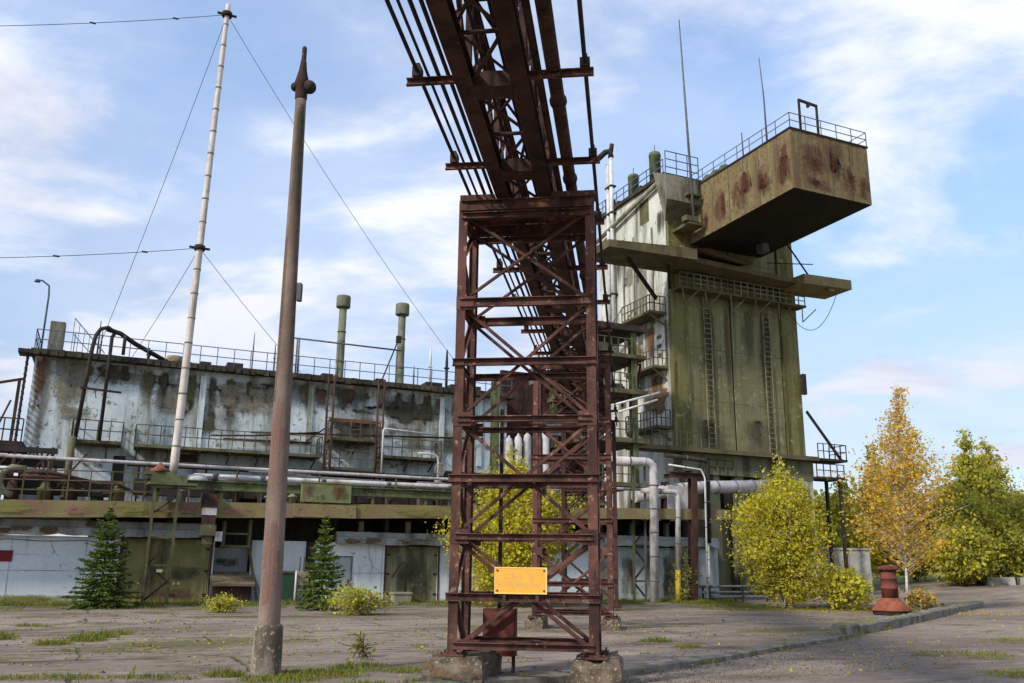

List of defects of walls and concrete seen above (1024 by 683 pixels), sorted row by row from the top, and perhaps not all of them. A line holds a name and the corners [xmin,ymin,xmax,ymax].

leakage [278,241,287,357]
rust [637,328,654,369]
leakage [742,311,771,387]
leakage [141,371,167,398]
leakage [186,376,235,406]
rust [641,375,662,399]